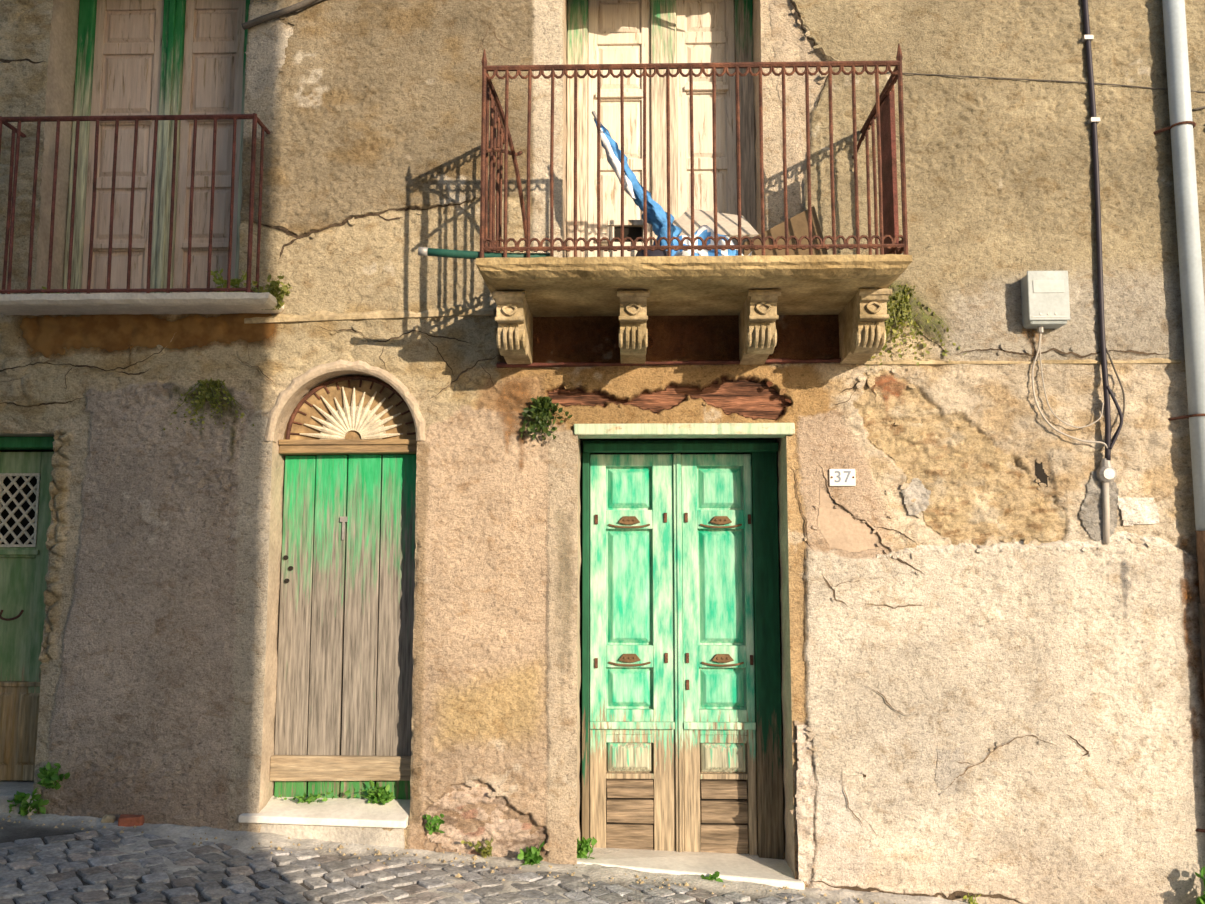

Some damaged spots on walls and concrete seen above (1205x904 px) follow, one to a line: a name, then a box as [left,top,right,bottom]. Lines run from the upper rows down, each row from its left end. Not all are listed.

crack [248,194,478,257]
spalling [812,369,1188,559]
crack [790,462,926,609]
crack [945,733,1092,789]
spalling [419,780,552,858]